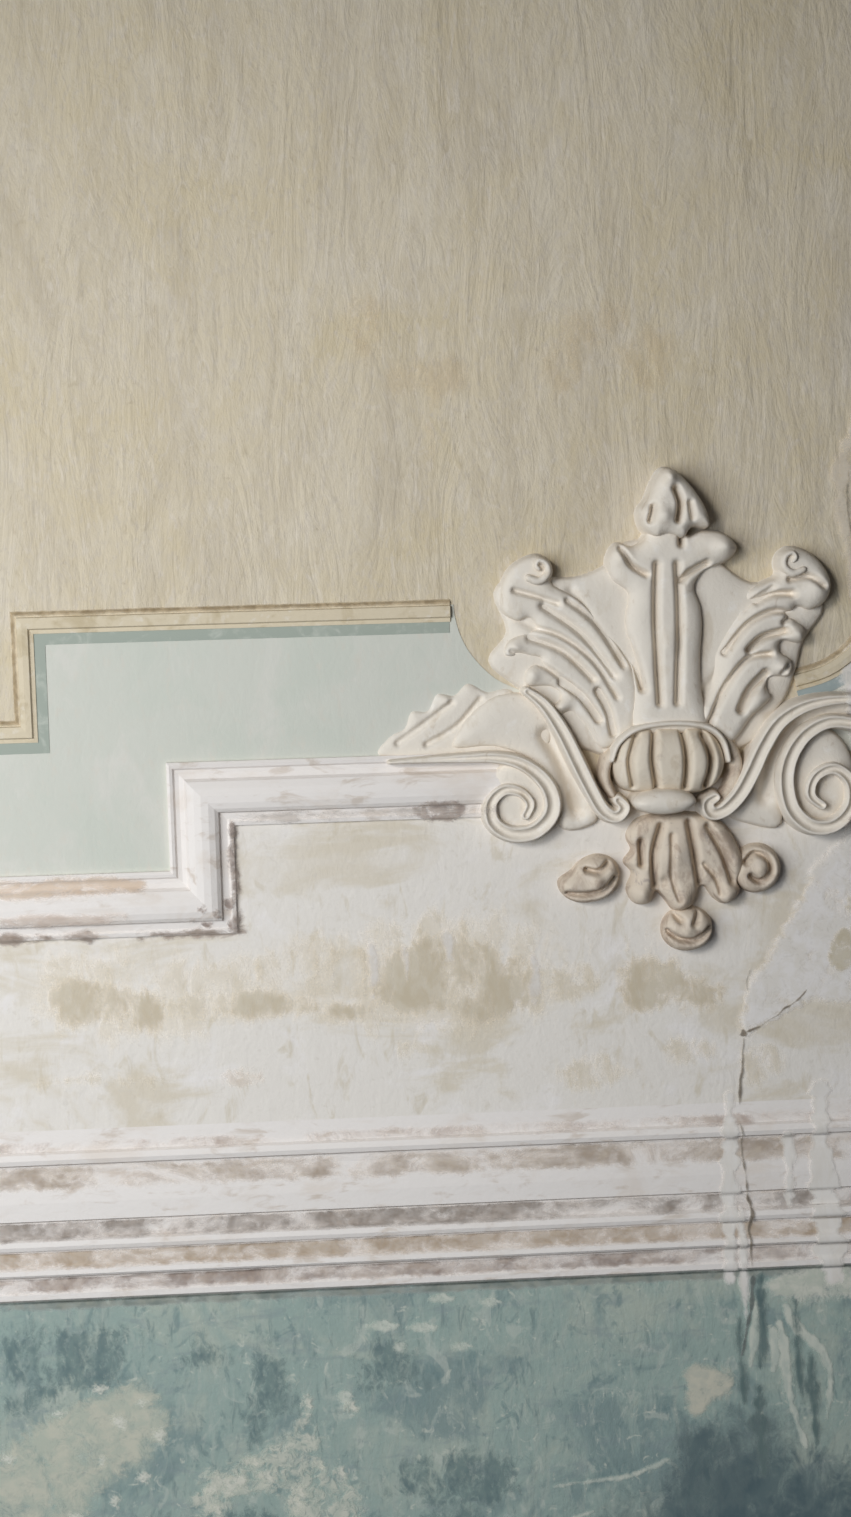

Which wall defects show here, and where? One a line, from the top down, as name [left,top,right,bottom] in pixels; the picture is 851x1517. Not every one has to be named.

crack [738,991,806,1356]